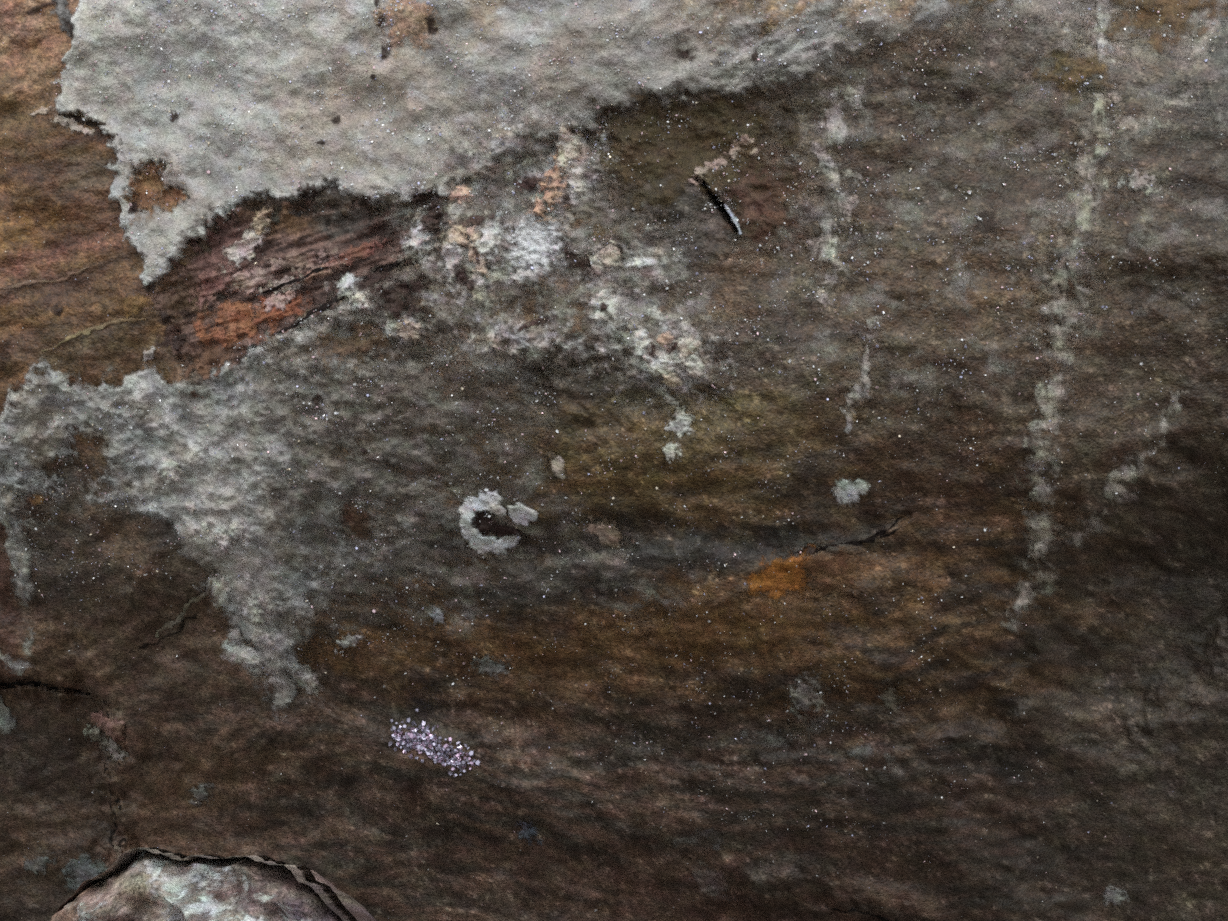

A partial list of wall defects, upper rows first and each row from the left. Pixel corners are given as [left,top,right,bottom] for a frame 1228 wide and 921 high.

damp [1091,0,1136,59]
damp [1164,86,1200,106]
damp [1186,9,1221,59]
spalling [145,183,430,398]
damp [0,0,1080,721]
damp [1005,92,1186,632]